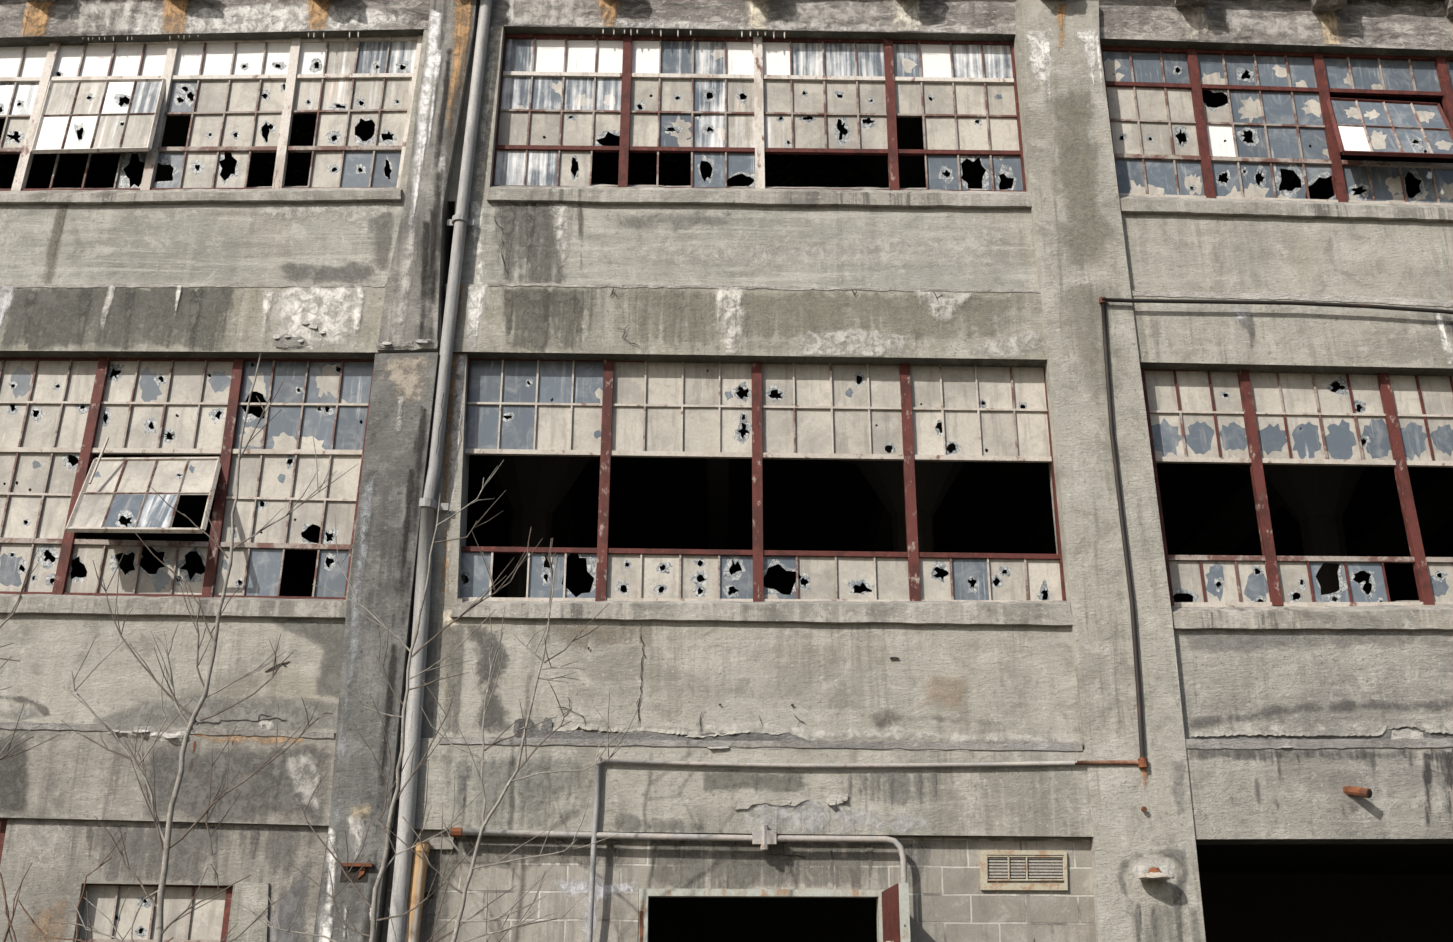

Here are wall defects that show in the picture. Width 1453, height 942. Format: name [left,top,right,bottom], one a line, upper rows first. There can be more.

rust [21,1,52,36]
rust [162,0,188,33]
rust [308,0,329,29]
rust [448,0,471,130]
water stain [0,205,232,351]
water stain [260,10,467,585]
water stain [451,0,873,486]
water stain [804,329,915,356]
water stain [442,610,509,733]
peeling [513,717,969,751]
water stain [1172,701,1453,824]
peeling [1187,722,1453,749]